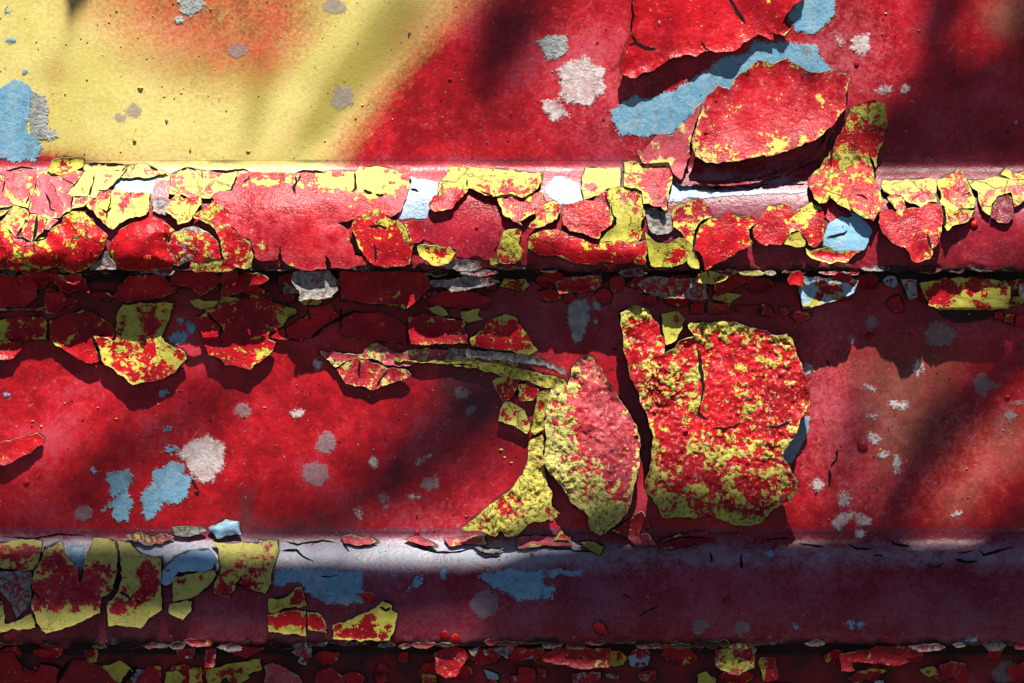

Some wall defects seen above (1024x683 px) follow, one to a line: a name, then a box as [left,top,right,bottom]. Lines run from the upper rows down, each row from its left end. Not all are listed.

peeling [0,0,1024,537]
peeling [0,445,778,683]
peeling [805,636,1024,683]